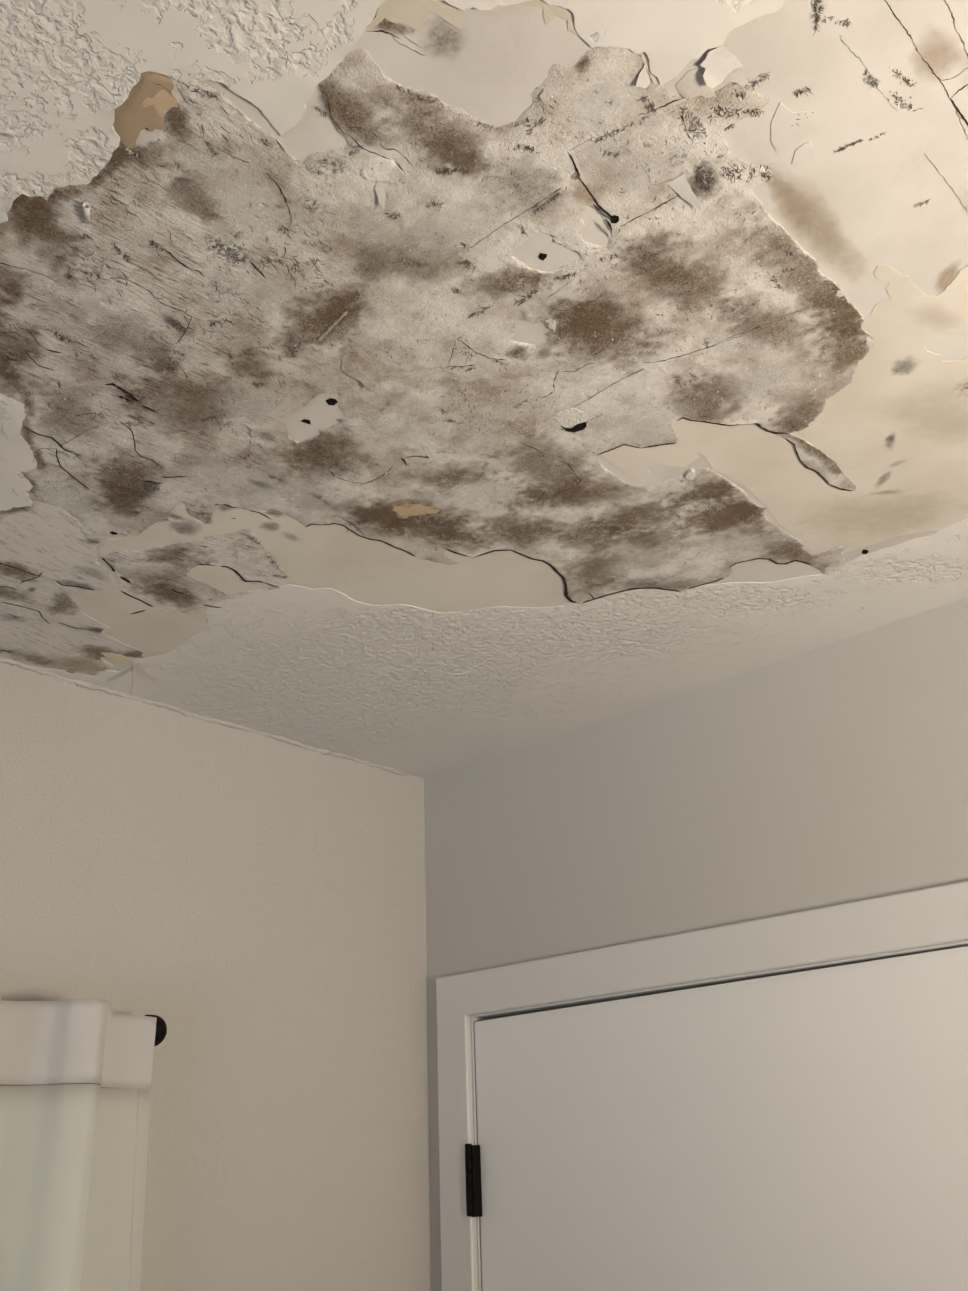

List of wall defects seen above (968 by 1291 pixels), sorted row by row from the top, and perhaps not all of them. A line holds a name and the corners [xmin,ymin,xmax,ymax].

crack [884,0,968,139]
leakage [13,146,163,267]
crack [470,137,677,248]
leakage [285,293,359,354]
peeling [0,0,968,697]
leakage [540,300,649,360]
leakage [755,230,866,366]
crack [24,383,186,489]
leakage [353,503,482,543]
leakage [565,480,810,562]
crack [0,557,221,630]
crack [446,549,811,604]